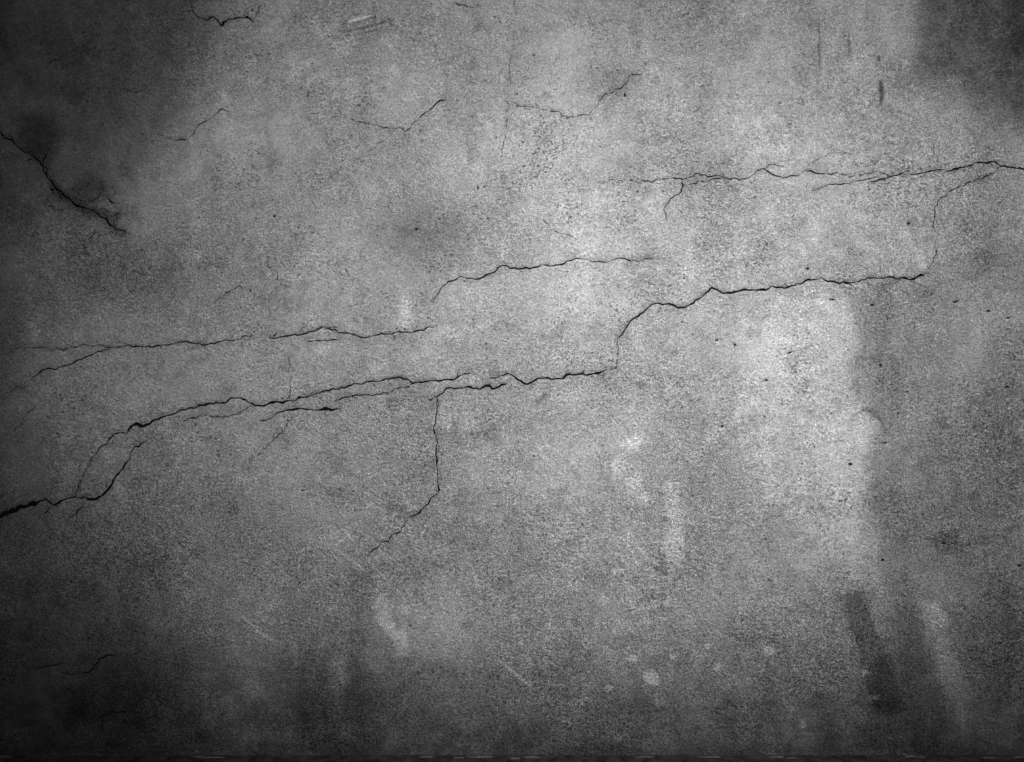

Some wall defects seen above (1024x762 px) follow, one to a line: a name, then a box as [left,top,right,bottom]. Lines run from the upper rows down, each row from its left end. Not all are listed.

crack [352,99,444,151]
crack [501,38,640,157]
crack [0,131,1024,556]